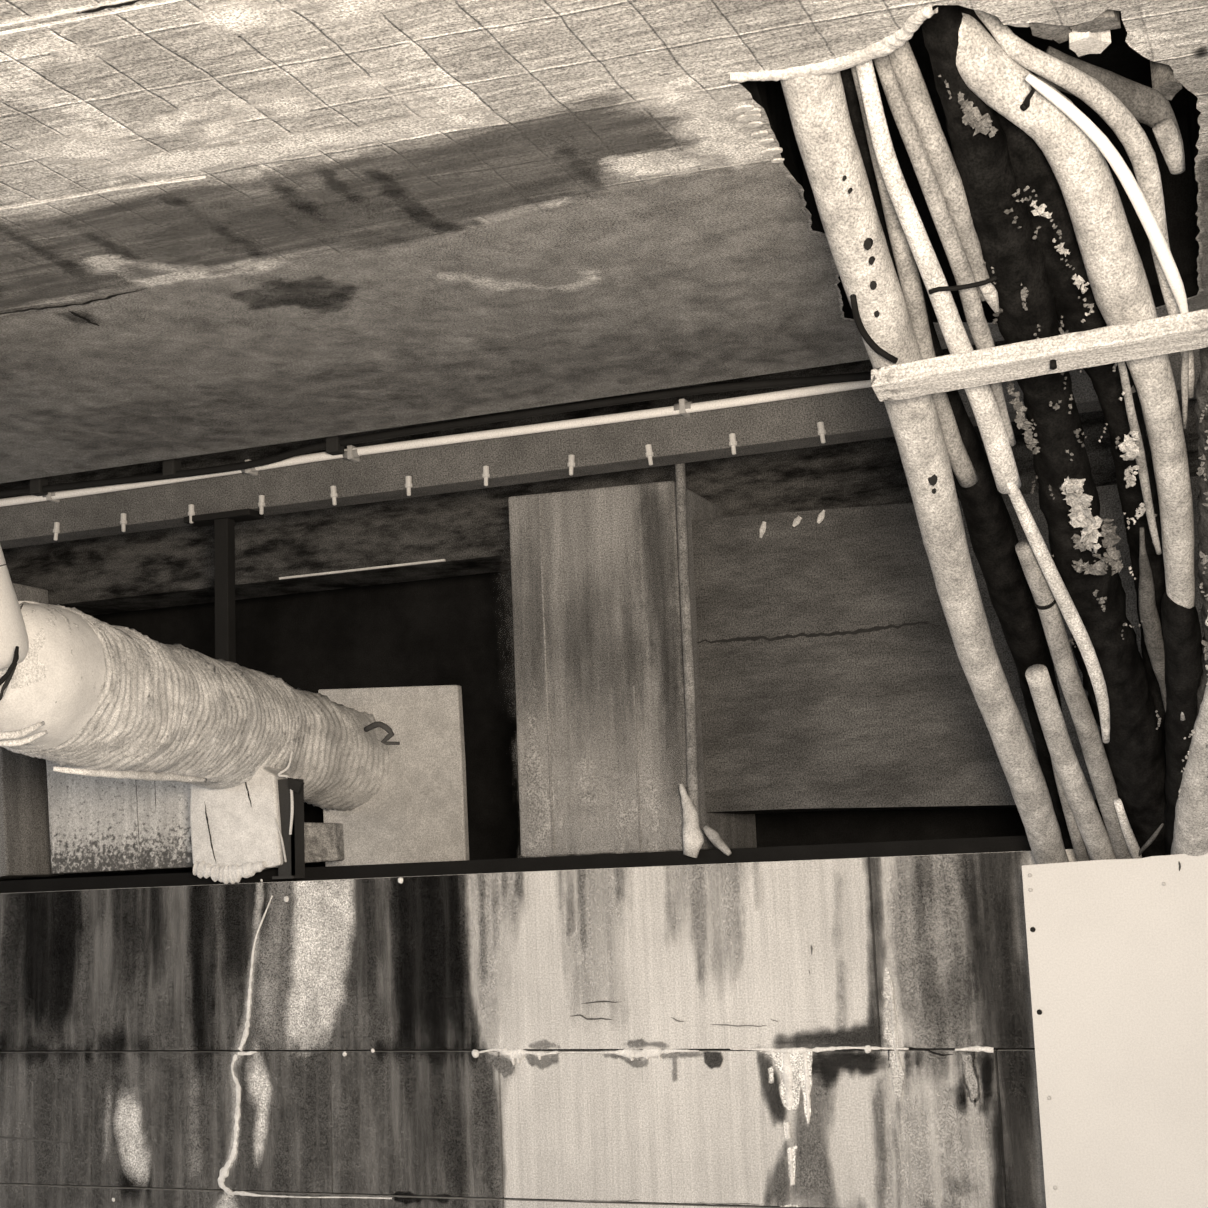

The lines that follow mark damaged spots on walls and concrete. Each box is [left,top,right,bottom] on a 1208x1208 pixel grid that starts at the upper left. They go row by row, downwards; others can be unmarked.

spalling [1007,9,1121,57]
damp [348,79,385,90]
spalling [1150,60,1182,100]
peeling [734,104,784,163]
damp [0,92,772,310]
spalling [863,238,875,265]
crack [697,621,928,643]
damp [0,851,1043,1208]